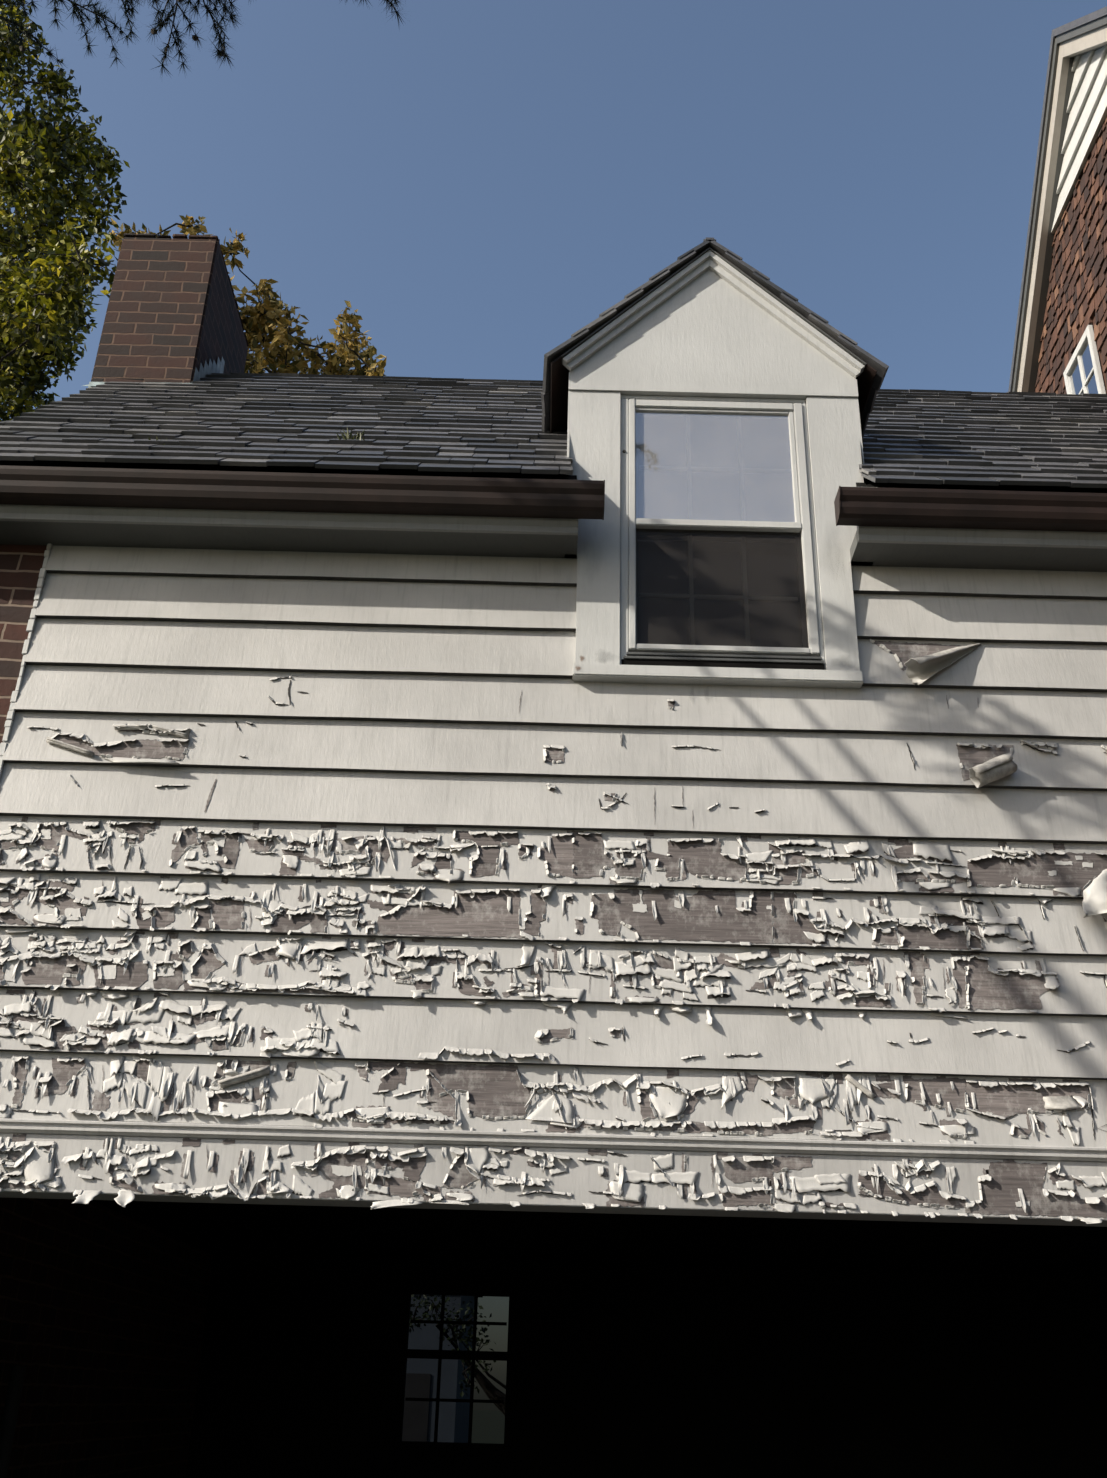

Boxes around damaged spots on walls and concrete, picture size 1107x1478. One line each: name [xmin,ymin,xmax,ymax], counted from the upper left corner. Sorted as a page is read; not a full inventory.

peeling [869,639,981,685]
peeling [27,723,190,764]
peeling [956,740,1058,788]
peeling [0,816,1107,1224]